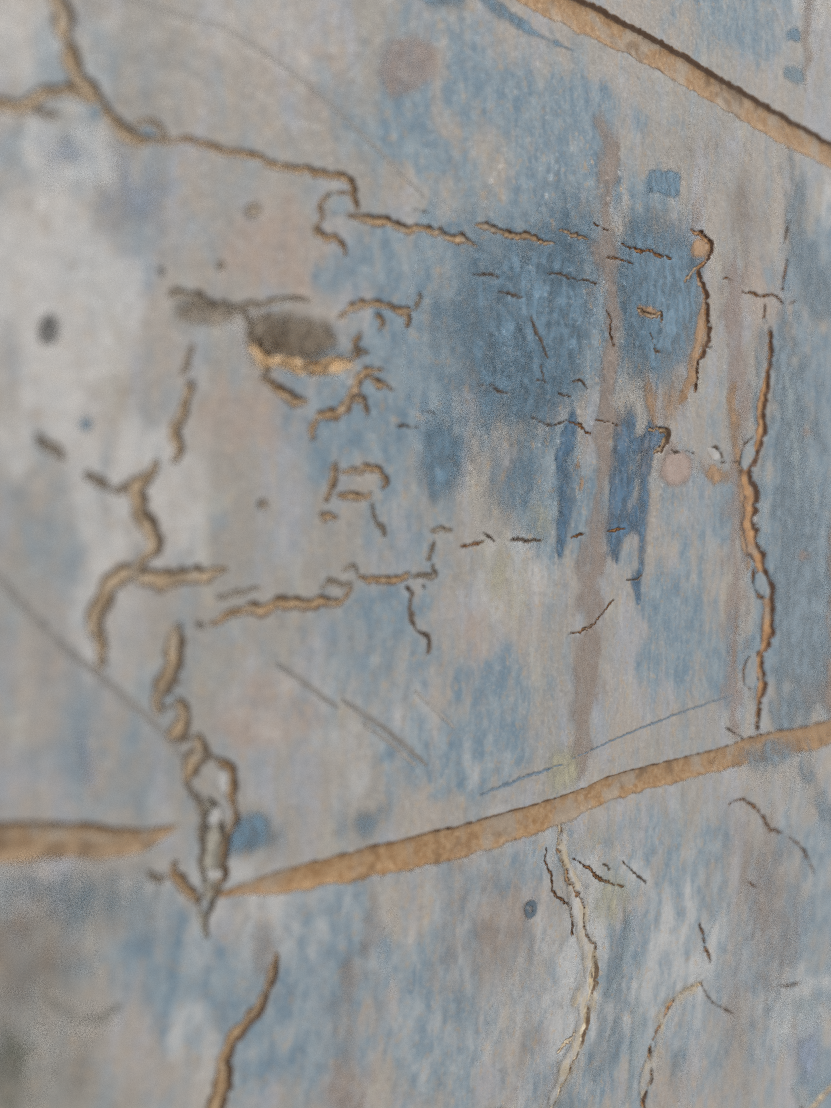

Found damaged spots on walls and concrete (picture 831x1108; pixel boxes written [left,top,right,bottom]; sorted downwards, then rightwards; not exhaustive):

crack [0,0,796,739]
crack [36,344,542,940]
crack [205,954,280,1108]
crack [544,824,646,1108]
crack [728,798,814,874]